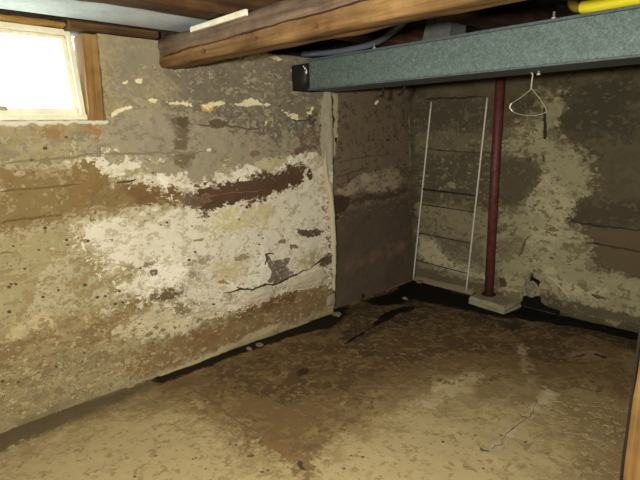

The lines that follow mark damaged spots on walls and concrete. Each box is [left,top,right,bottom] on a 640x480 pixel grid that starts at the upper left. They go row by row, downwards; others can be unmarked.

peeling [202,101,225,110]
water stain [411,90,495,293]
water stain [493,64,640,327]
spalling [234,231,304,298]
crack [224,253,330,293]
crack [480,400,537,452]